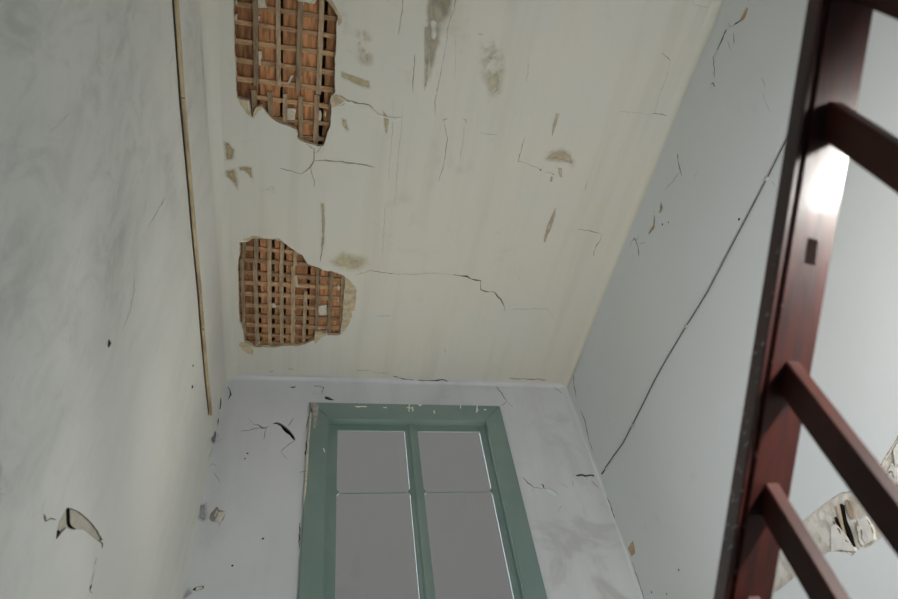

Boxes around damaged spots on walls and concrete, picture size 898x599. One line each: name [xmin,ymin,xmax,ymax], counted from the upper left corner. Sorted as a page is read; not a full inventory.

flaking render [233,0,347,147]
leakage [425,0,449,64]
crack [711,1,749,87]
crack [280,55,555,319]
flaking render [238,236,357,355]
crack [209,387,232,482]
crack [243,416,309,472]
peeling [887,442,898,485]
peeling [831,516,877,552]